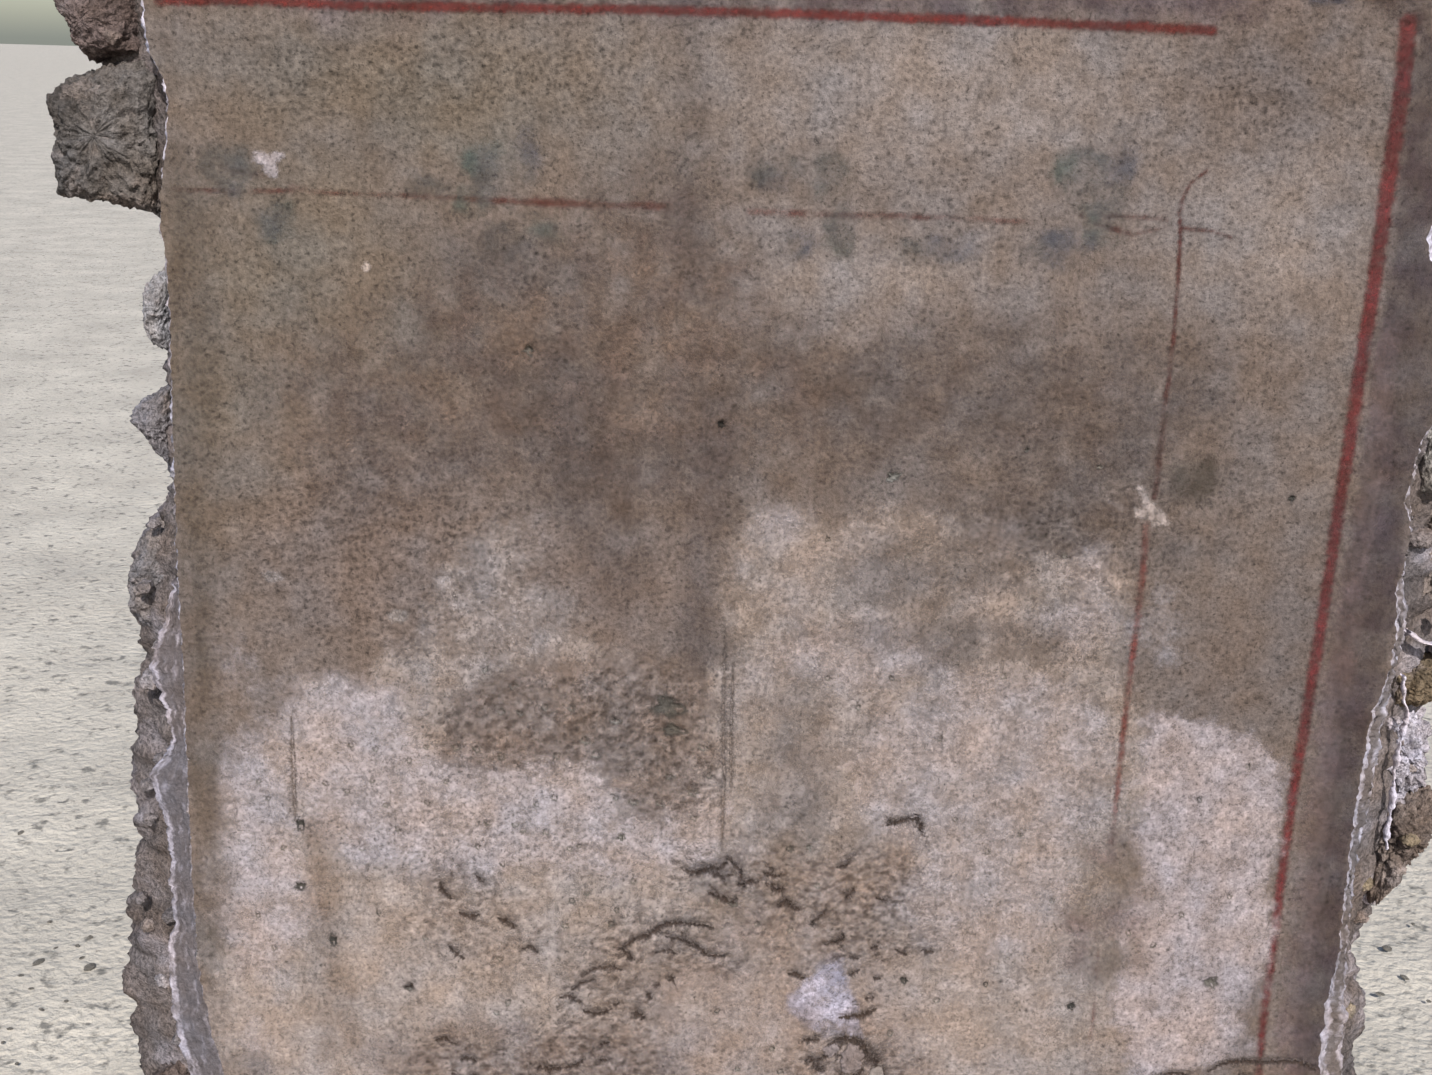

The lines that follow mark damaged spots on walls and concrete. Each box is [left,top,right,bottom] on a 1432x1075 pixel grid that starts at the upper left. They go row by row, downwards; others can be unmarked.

spalling [1318,427,1432,1075]
crack [886,814,927,838]
crack [581,853,915,984]
crack [799,1032,904,1075]
crack [1156,1056,1316,1075]